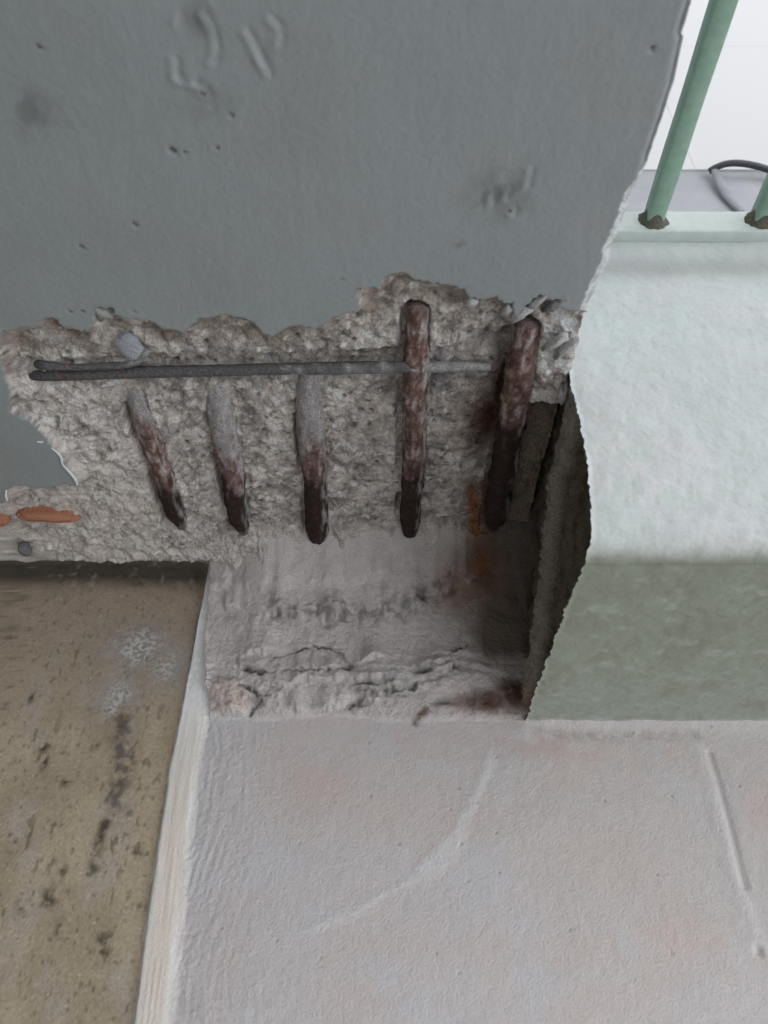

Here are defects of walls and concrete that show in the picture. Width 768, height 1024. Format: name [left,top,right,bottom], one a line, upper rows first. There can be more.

corrosion [474,365,505,440]
spalling [0,161,647,721]
efflorescence [113,629,181,681]
leakage [101,682,132,730]
crack [244,646,347,717]
corrosion [465,680,523,710]
leakage [98,820,110,843]